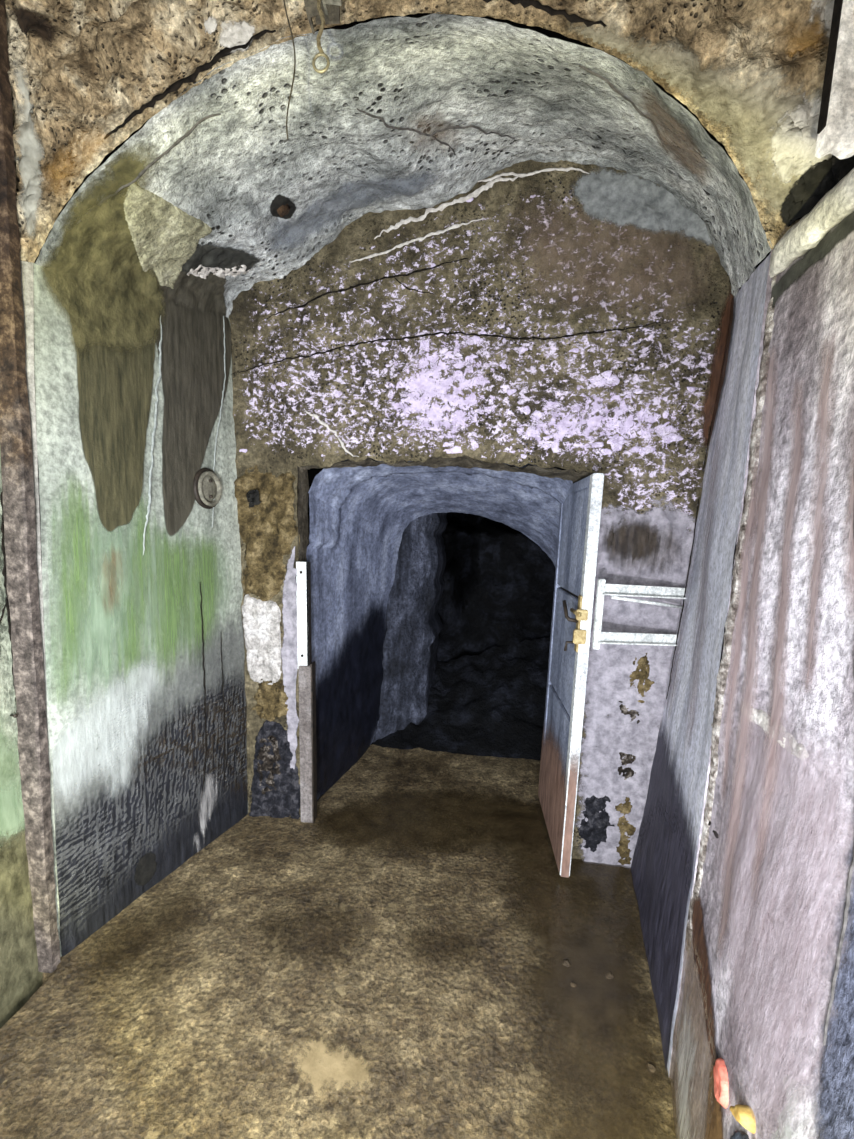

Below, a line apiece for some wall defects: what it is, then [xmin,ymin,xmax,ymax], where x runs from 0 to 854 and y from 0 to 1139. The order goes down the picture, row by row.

crack [483,0,606,28]
crack [104,29,276,139]
damp [42,147,260,957]